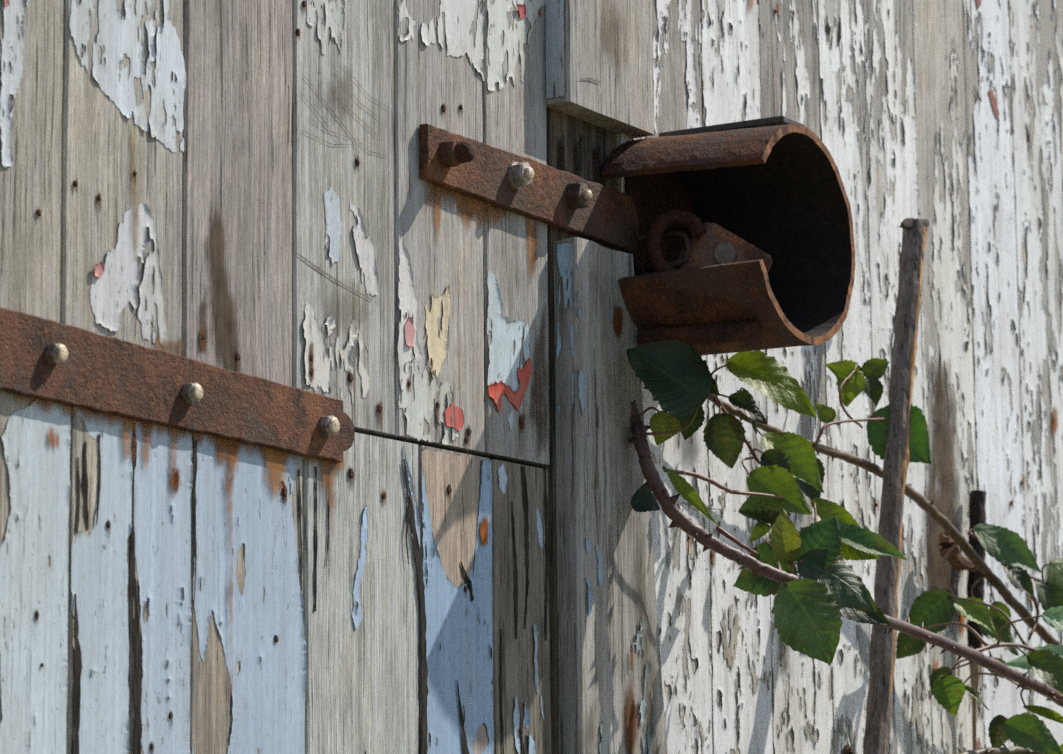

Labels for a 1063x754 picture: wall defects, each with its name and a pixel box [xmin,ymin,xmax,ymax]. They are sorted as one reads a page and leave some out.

peeling [0,0,30,167]
peeling [69,0,187,153]
peeling [399,0,545,92]
peeling [90,203,168,347]
corrosion [431,183,508,239]
peeling [486,271,530,392]
corrosion [528,219,537,274]
corrosion [615,305,623,338]
peeling [621,0,1063,754]
corrosion [18,395,355,546]
peeling [397,238,507,754]
peeling [0,399,306,754]